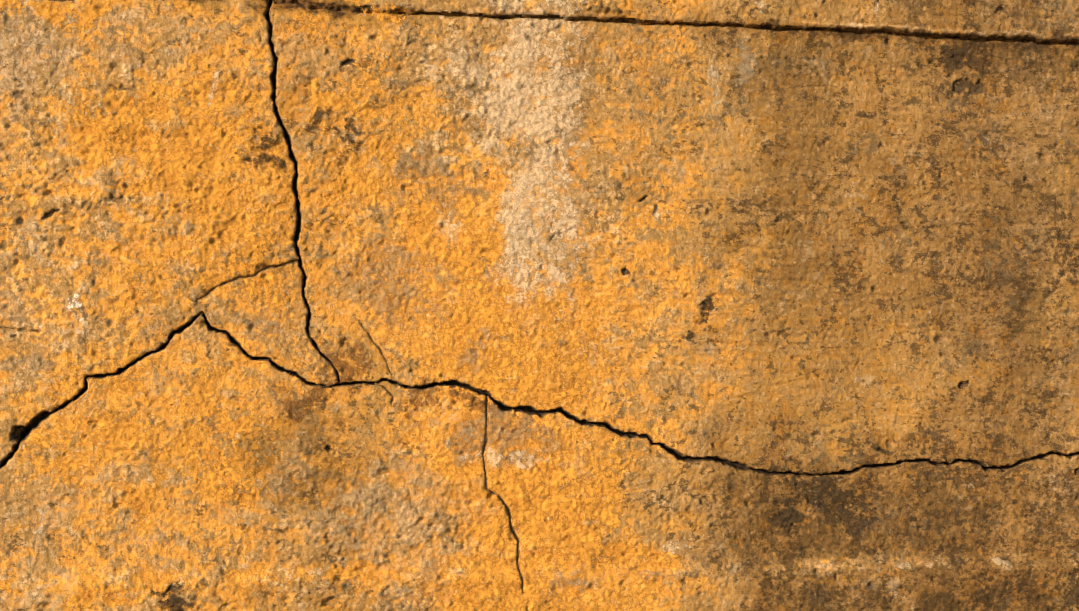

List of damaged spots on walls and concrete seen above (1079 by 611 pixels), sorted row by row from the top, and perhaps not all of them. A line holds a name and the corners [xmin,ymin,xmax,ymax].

leakage [928,40,987,76]
crack [264,0,341,383]
crack [195,259,297,301]
leakage [1039,230,1079,309]
leakage [685,295,717,341]
crack [0,312,1079,593]
leakage [767,469,876,536]
leakage [1063,554,1079,610]